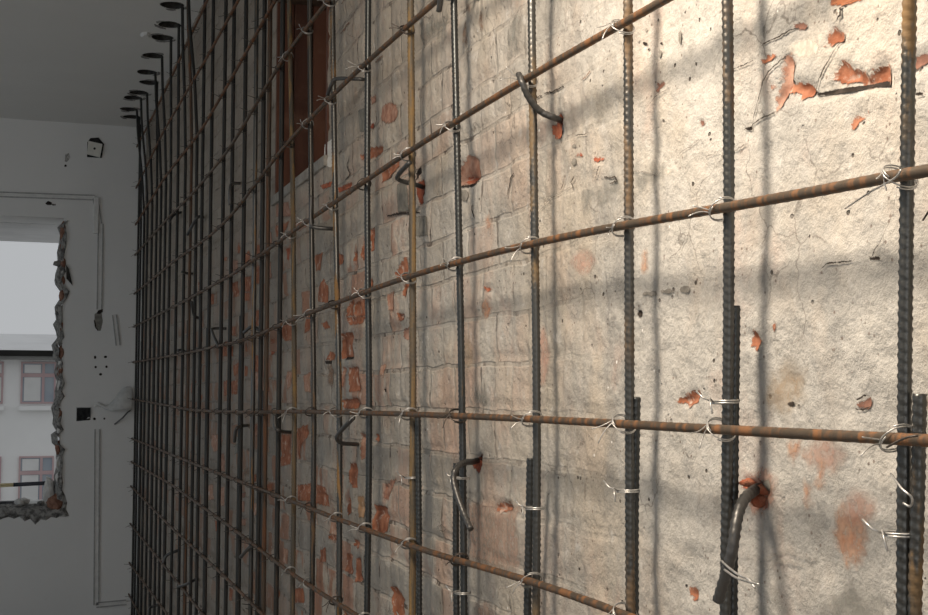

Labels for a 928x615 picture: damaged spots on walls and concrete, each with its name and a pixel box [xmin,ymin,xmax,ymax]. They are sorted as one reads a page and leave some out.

spalling [830,0,861,9]
crack [816,9,845,90]
crack [734,22,807,151]
spalling [761,54,891,111]
spalling [461,155,481,188]
crack [822,238,882,268]
spalling [0,220,72,524]
rust [540,330,548,382]
spalling [677,390,700,408]
spalling [855,395,872,411]
spalling [456,465,470,513]
spalling [739,469,773,513]